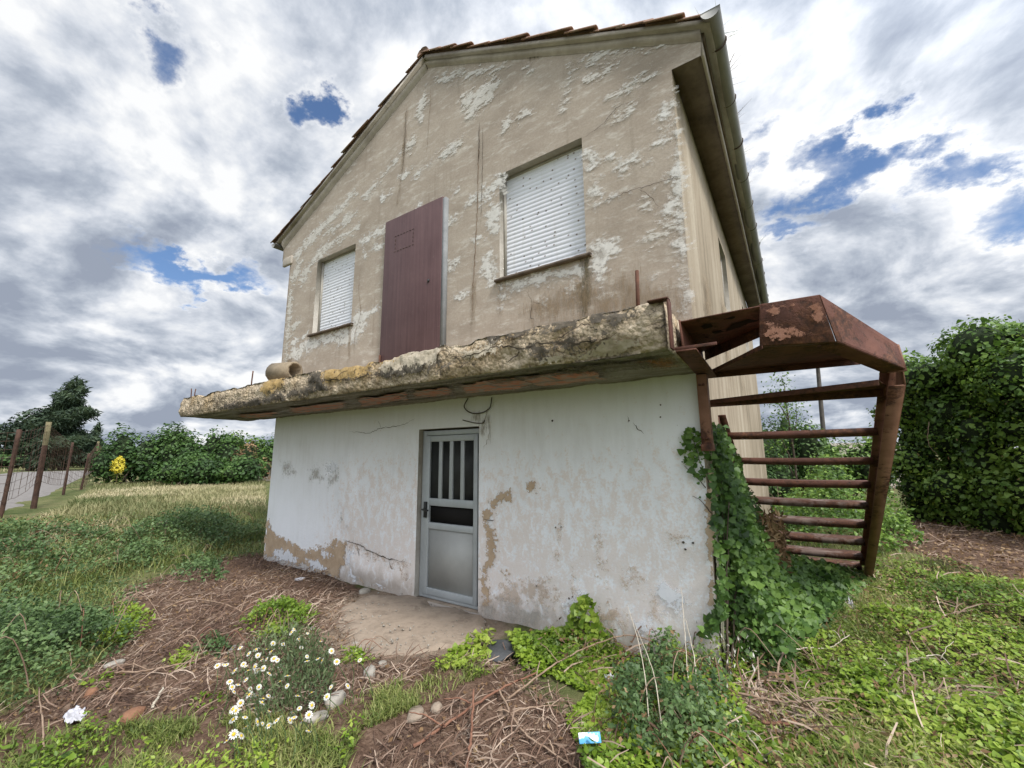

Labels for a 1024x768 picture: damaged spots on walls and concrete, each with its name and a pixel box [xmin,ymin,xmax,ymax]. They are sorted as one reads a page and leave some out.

peeling [500,109,537,134]
peeling [560,44,665,113]
peeling [604,70,658,123]
peeling [283,61,507,362]
crack [472,122,483,311]
peeling [448,172,622,309]
peeling [581,101,695,313]
flaking render [237,336,641,418]
flaking render [263,520,405,589]
flaking render [478,488,587,615]